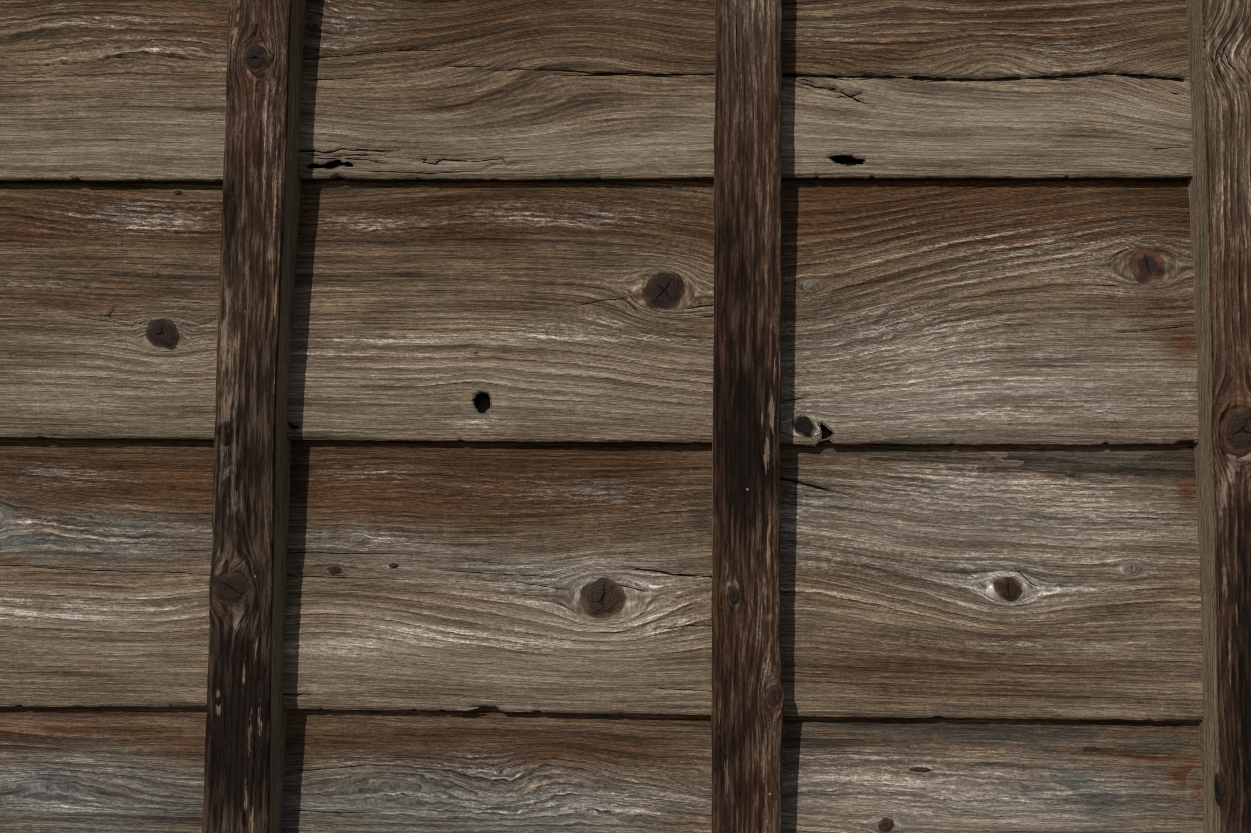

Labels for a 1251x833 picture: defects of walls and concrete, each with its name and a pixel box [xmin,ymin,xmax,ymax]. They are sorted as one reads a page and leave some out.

crack [1210,48,1251,81]
crack [782,72,1184,109]
crack [299,148,509,174]